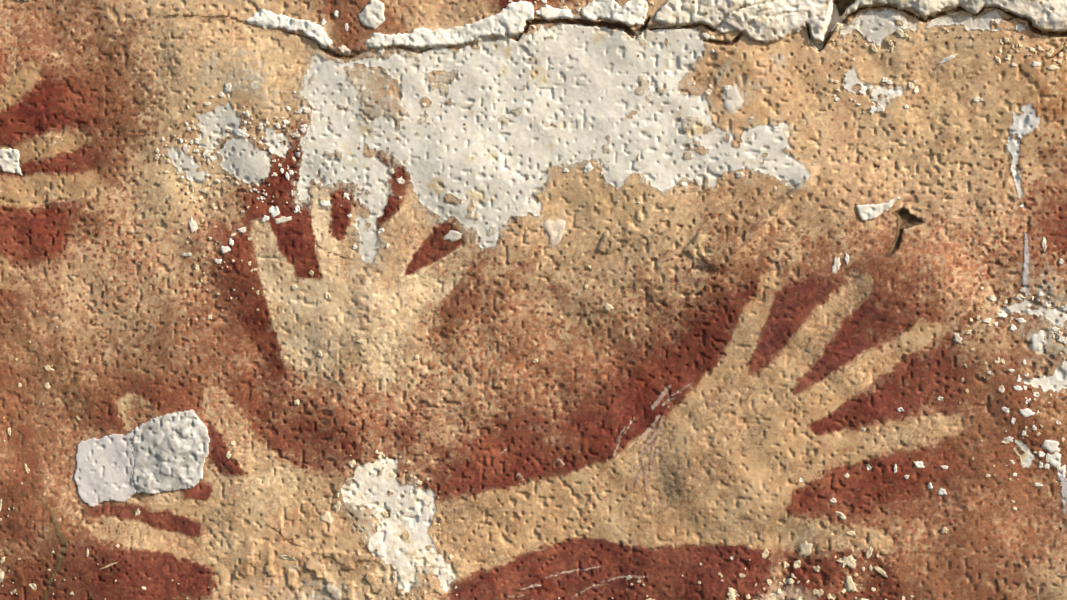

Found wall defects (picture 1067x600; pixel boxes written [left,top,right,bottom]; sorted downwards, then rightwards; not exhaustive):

crack [505,6,746,45]
crack [847,5,1067,59]
spalling [155,0,814,299]
spalling [856,197,925,256]
spalling [320,449,460,600]